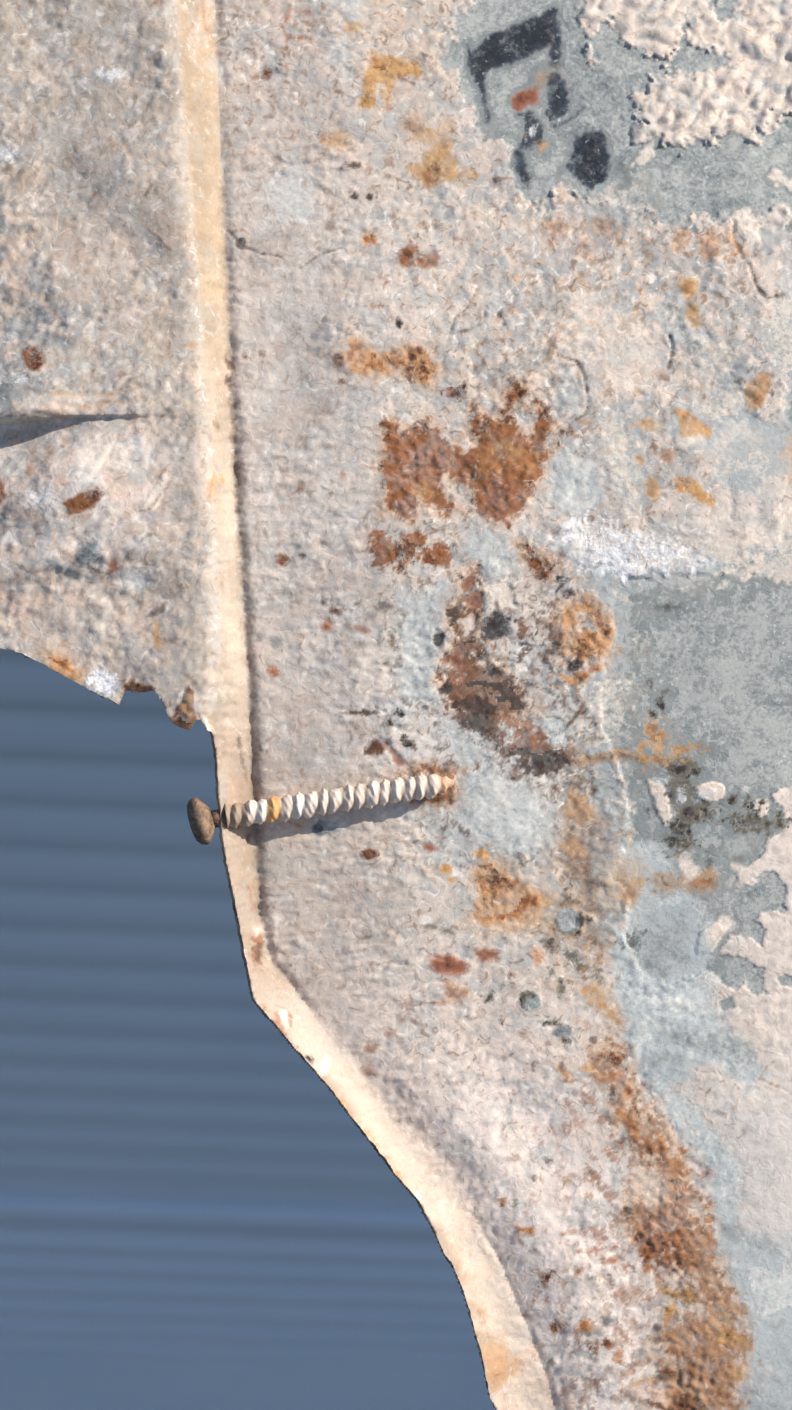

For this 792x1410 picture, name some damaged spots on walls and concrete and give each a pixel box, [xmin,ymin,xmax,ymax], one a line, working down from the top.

peeling [381,0,792,865]
corrosion [218,762,246,812]
corrosion [239,878,276,979]
corrosion [257,298,636,1204]
corrosion [437,1216,537,1402]
corrosion [491,969,778,1410]
peeling [610,832,792,1409]